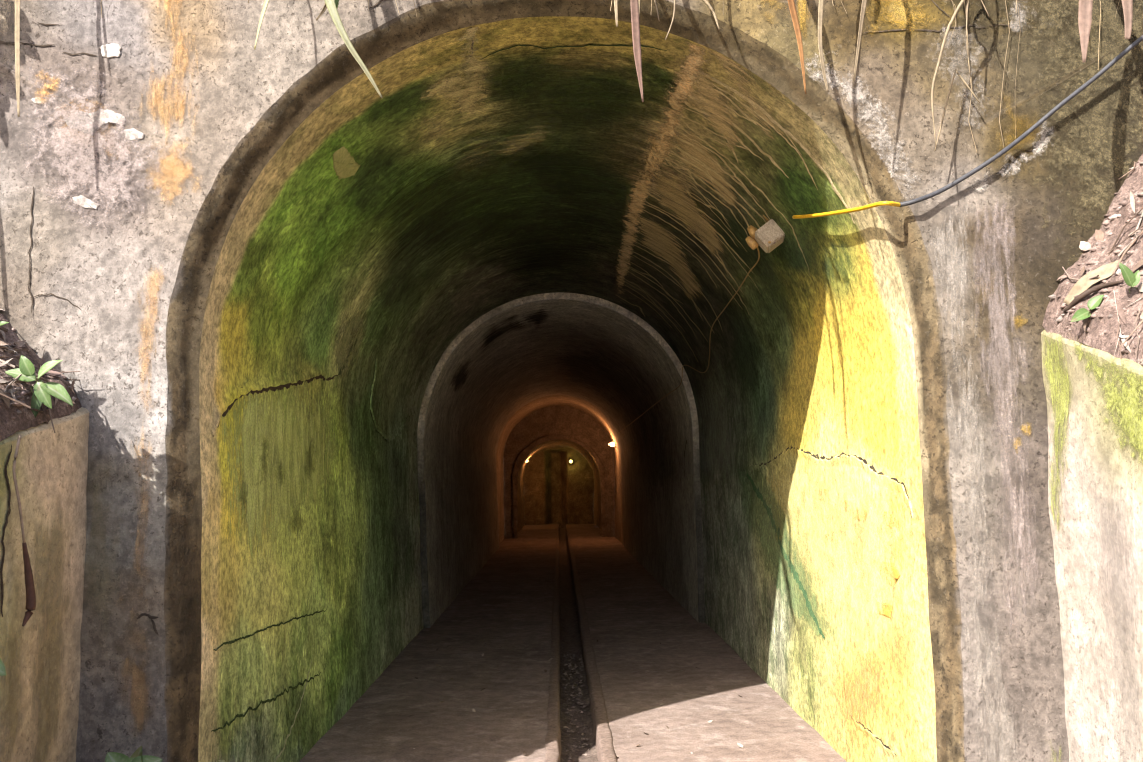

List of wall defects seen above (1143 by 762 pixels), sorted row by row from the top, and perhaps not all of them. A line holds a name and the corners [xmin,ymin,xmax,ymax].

damp [806,52,917,187]
crack [28,187,81,313]
damp [616,71,855,350]
crack [209,343,356,437]
damp [980,209,1024,565]
crack [0,445,12,617]
crack [748,447,913,521]
crack [214,610,326,651]
crack [211,672,321,732]